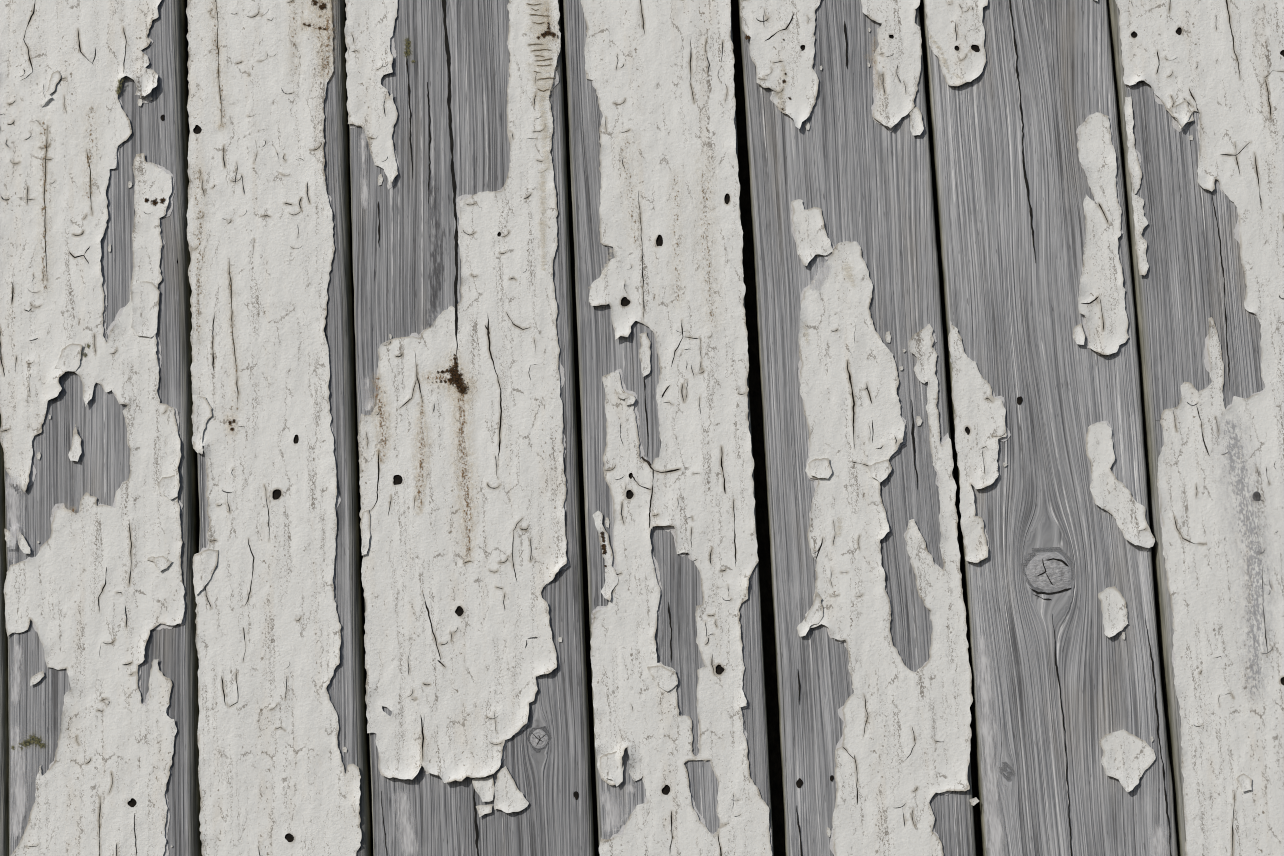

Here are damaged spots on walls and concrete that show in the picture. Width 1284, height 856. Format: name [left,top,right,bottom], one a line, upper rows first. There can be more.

peeling [861,0,988,136]
peeling [0,0,822,856]
rust [427,354,472,555]
peeling [791,199,1011,856]
peeling [1073,0,1284,856]